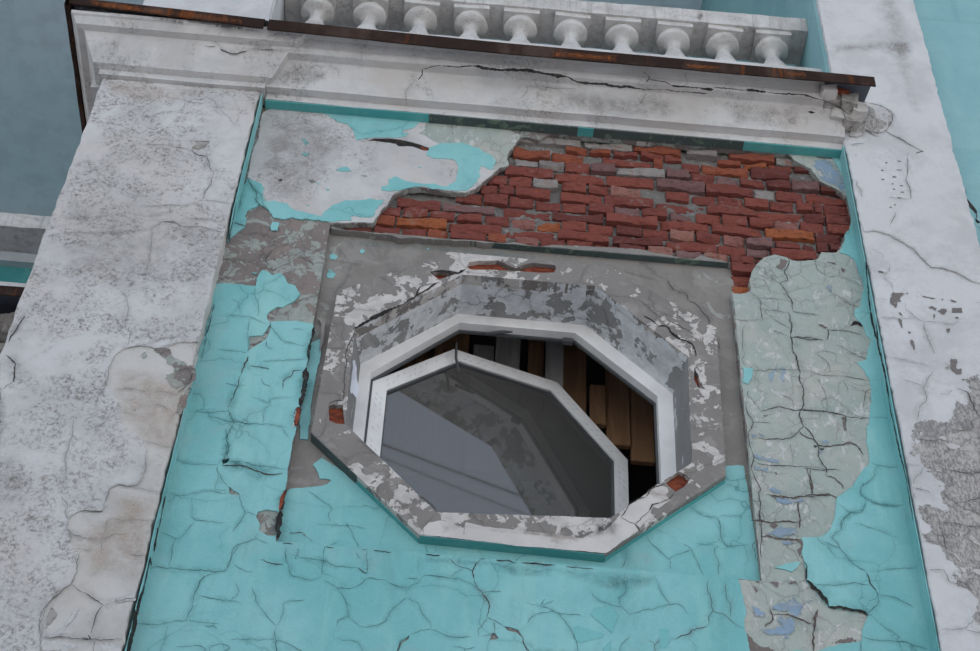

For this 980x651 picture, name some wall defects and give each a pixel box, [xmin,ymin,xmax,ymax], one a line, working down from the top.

crack [0,316,25,422]
crack [58,141,265,275]
crack [39,269,591,651]
spalling [227,109,871,651]
crack [405,63,862,144]
crack [592,259,980,651]
peeling [890,292,915,350]
crack [873,105,965,351]
peeling [923,296,962,333]
spalling [910,359,980,625]